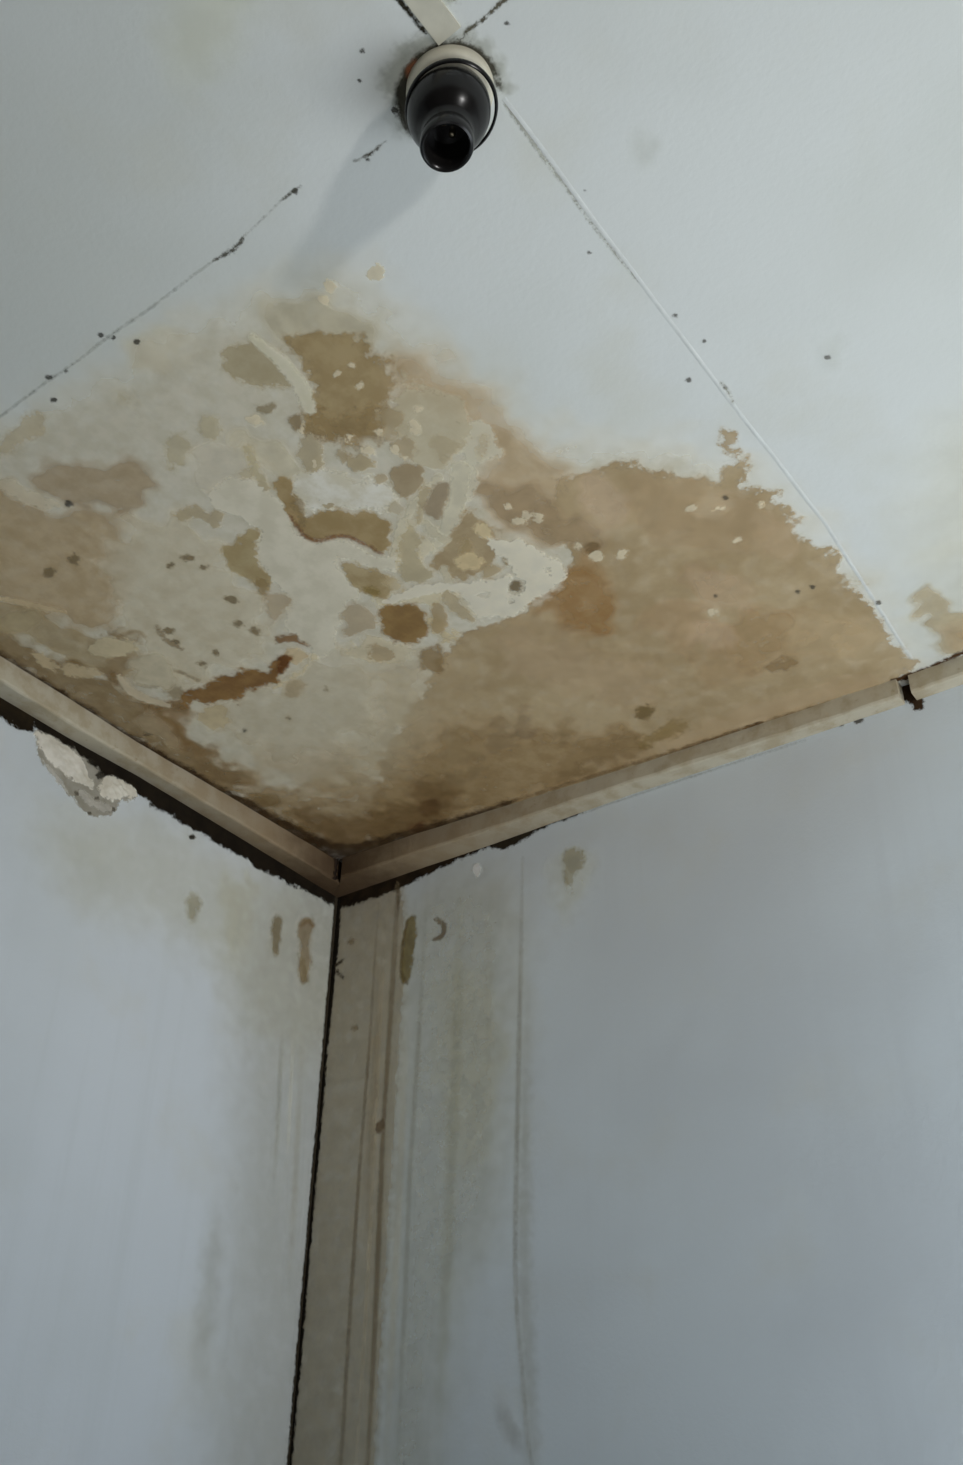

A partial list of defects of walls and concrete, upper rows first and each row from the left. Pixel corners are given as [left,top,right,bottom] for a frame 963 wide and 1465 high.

crack [464,0,507,33]
crack [214,237,244,261]
peeling [32,335,568,757]
leakage [0,307,919,860]
peeling [576,543,627,562]
leakage [915,589,963,653]
crack [891,652,963,710]
crack [666,722,763,755]
spalling [34,730,138,817]
leakage [291,890,404,1465]